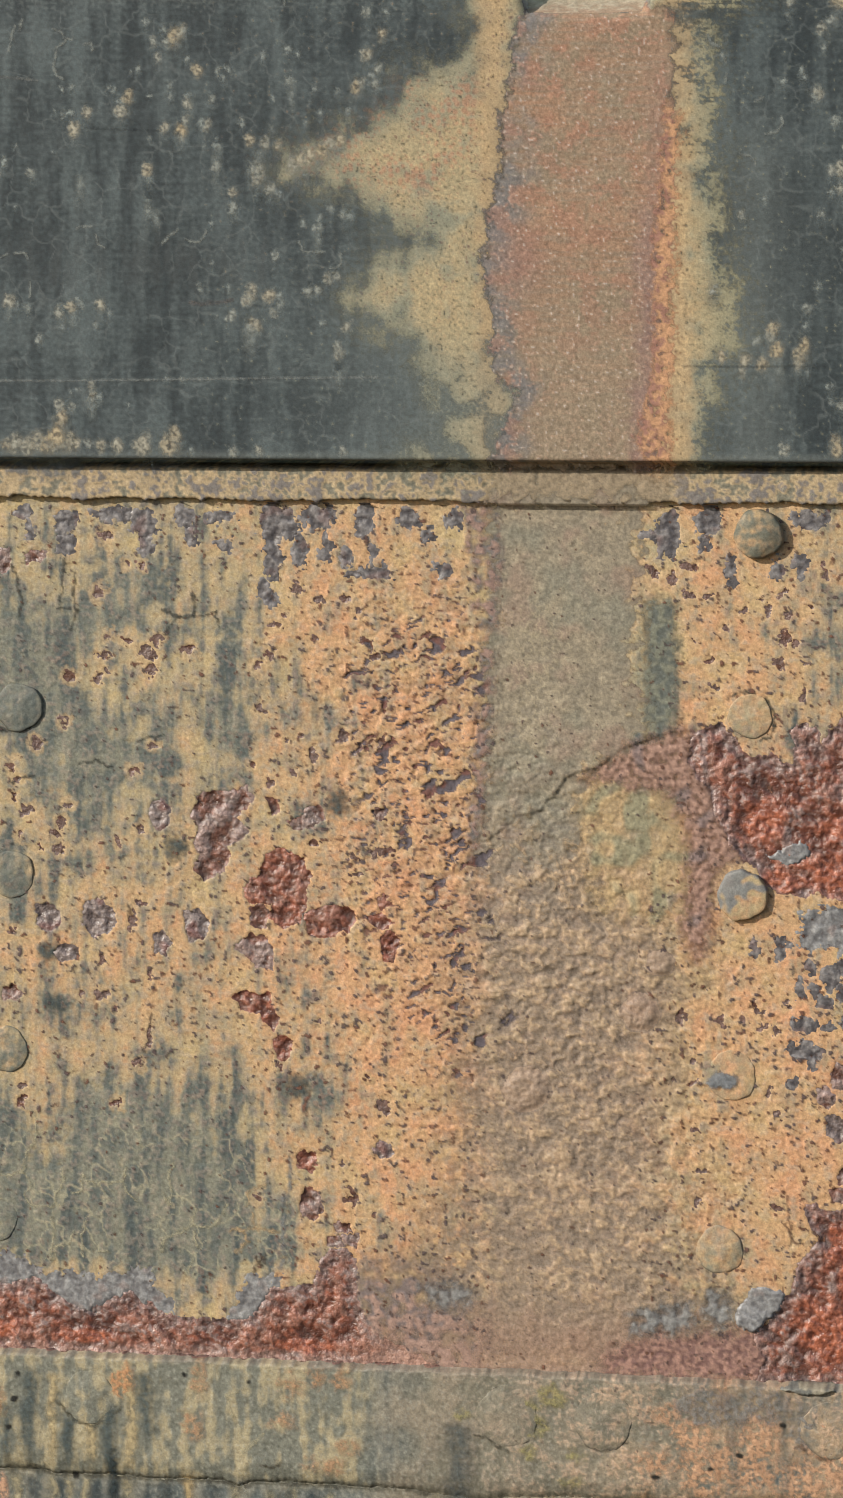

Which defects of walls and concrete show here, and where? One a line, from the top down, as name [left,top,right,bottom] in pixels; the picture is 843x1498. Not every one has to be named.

peeling [240,0,524,477]
corrosion [479,2,682,485]
damp [39,943,56,958]
damp [166,839,187,857]
peeling [0,501,528,1364]
corrosion [0,484,843,1406]
damp [2,1371,150,1498]
corrosion [640,1404,843,1498]